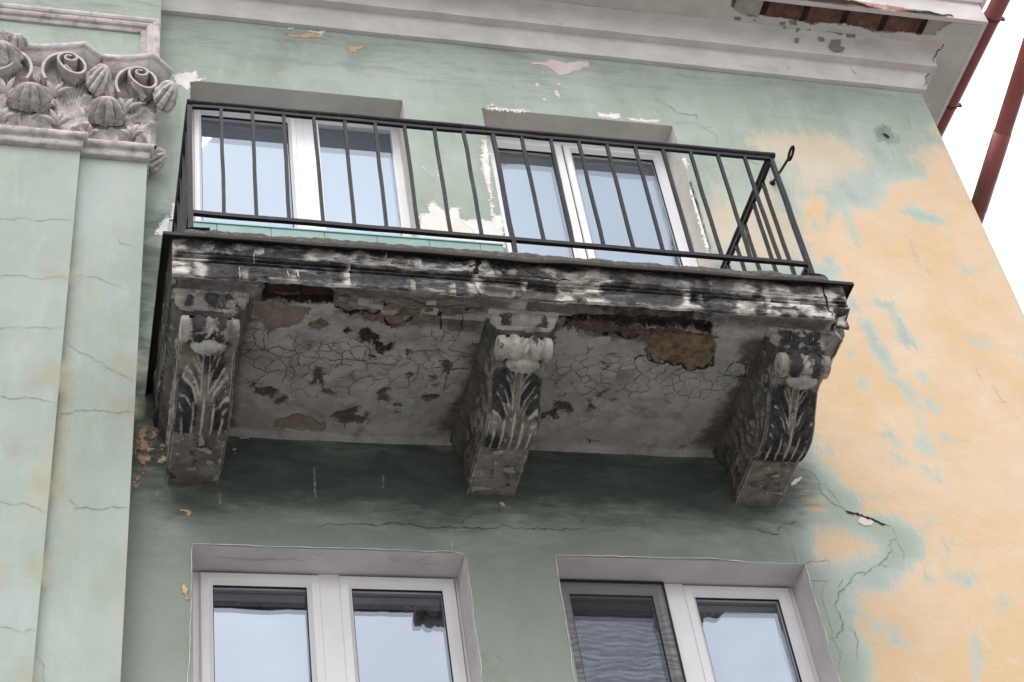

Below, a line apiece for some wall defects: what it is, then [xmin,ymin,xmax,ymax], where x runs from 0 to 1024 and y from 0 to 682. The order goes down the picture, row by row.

flaking render [731,0,953,51]
peeling [172,70,206,92]
spalling [531,59,589,100]
flaking render [417,139,508,247]
peeling [175,247,232,278]
flaking render [191,244,346,381]
spalling [309,366,338,395]
crack [239,259,570,405]
flaking render [391,257,713,341]
crack [545,331,751,403]
peeling [133,426,176,488]
crack [801,467,904,658]